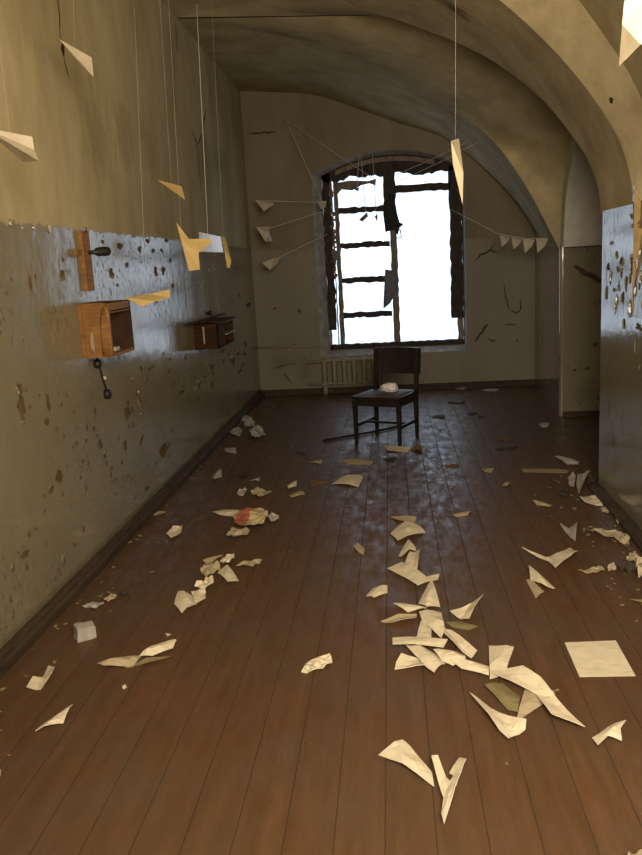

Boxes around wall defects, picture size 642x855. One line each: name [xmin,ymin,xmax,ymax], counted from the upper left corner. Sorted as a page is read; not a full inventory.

crack [57,0,69,77]
peeling [138,238,172,277]
peeling [574,241,642,353]